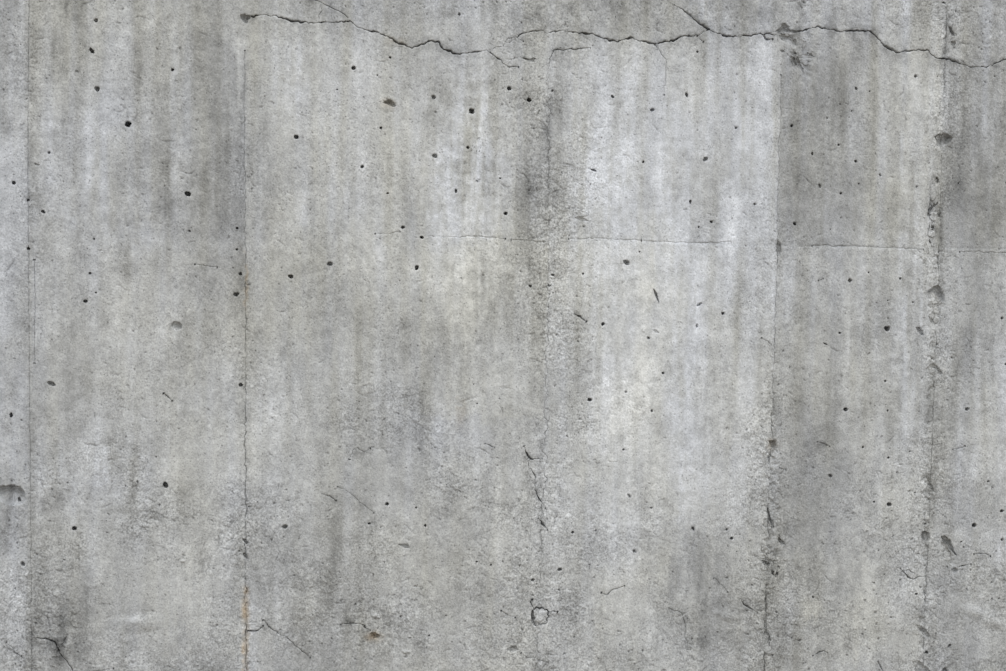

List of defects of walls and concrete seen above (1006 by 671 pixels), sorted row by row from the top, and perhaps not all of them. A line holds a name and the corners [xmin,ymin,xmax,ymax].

crack [239,0,1006,94]
spalling [0,483,28,507]